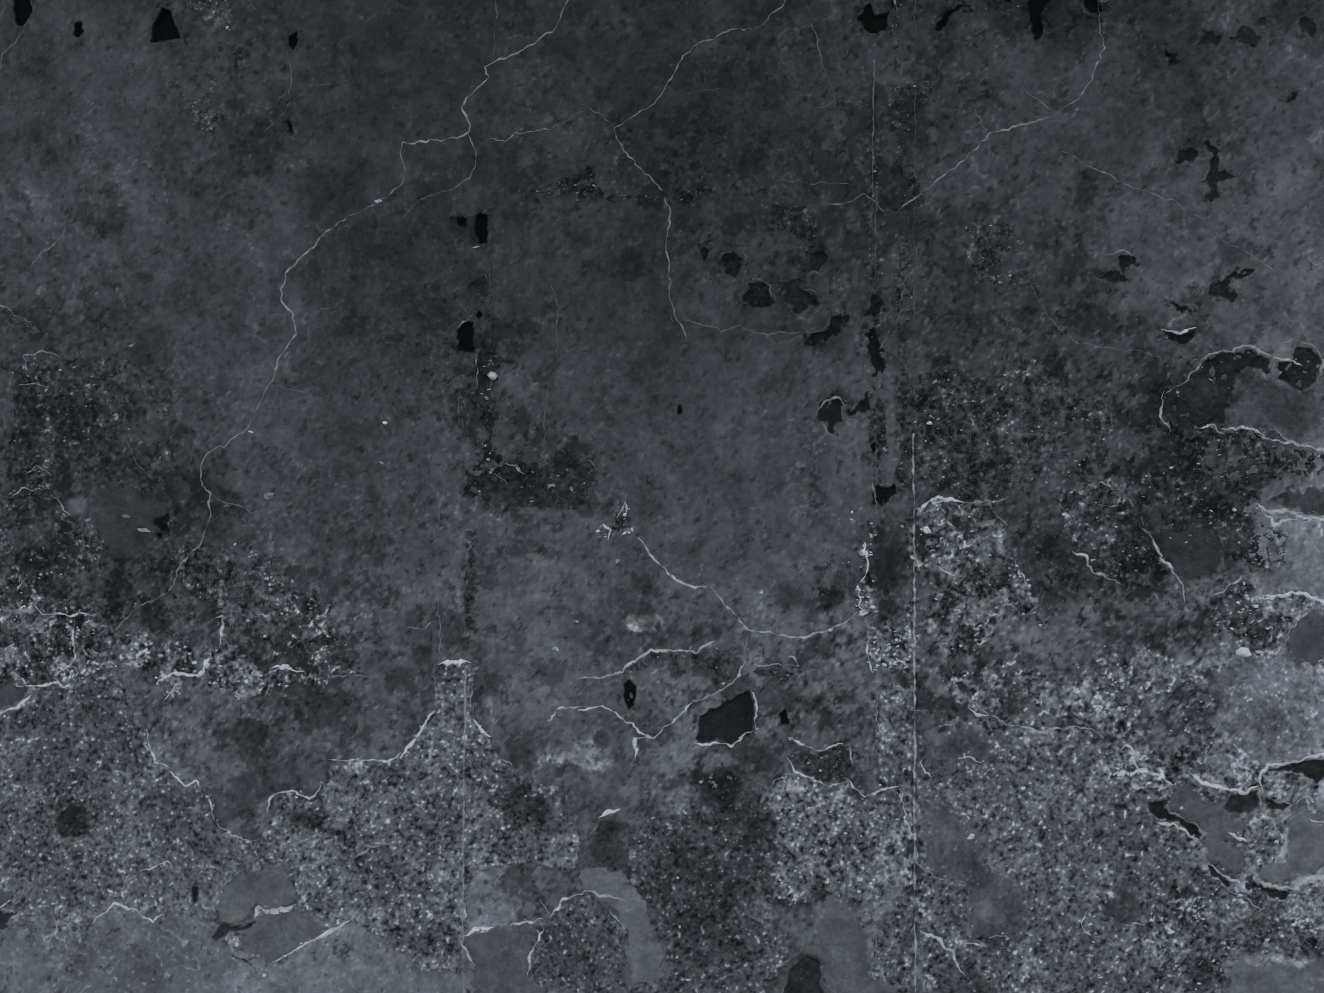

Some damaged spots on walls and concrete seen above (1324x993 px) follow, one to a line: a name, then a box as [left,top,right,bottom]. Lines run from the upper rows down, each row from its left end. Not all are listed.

crack [776,0,1108,349]
crack [1059,150,1286,277]
crack [115,0,869,631]
spalling [510,0,1324,993]
spalling [0,303,606,993]
crack [405,571,442,660]
crack [638,537,857,675]
crack [547,703,692,758]
crack [587,809,620,840]